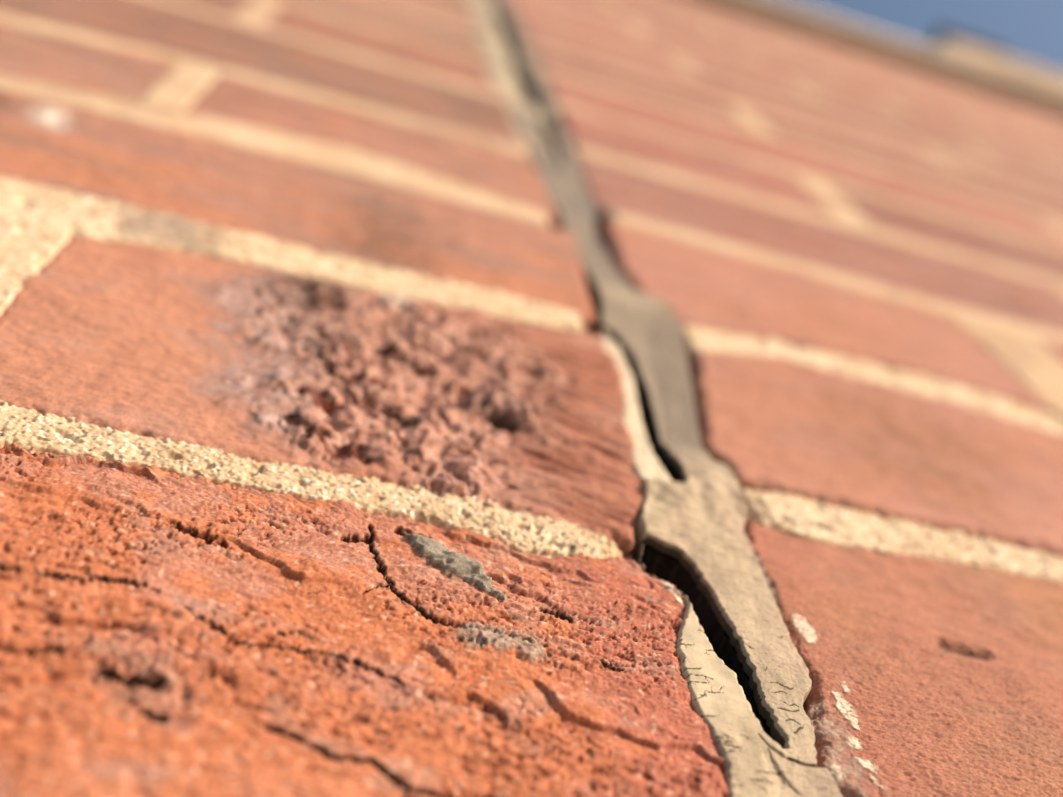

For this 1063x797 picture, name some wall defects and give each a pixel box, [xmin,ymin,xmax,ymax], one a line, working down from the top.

crack [491,0,563,166]
spalling [246,283,556,505]
crack [595,324,678,482]
crack [0,565,162,593]
crack [362,525,460,627]
crack [2,646,77,659]
crack [185,608,410,688]
crack [601,661,626,673]
crack [634,542,817,797]
crack [258,723,444,797]
leakage [807,703,864,797]